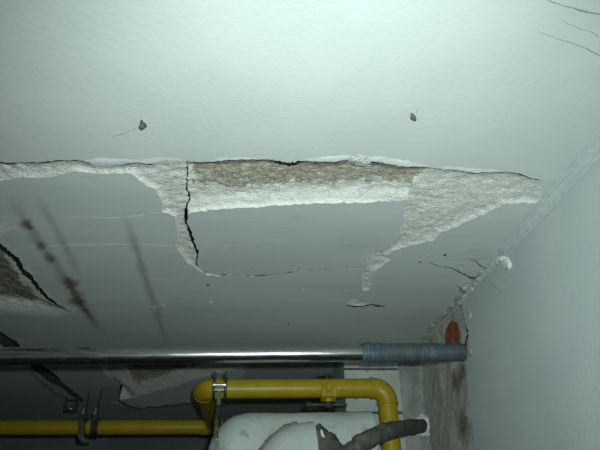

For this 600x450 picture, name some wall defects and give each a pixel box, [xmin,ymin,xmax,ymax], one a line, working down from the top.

crack [0,159,95,167]
crack [371,162,541,181]
crack [184,159,349,273]
spalling [0,155,544,291]
spalling [0,222,84,317]
crack [0,244,170,312]
crack [433,259,486,293]
spalling [101,363,242,400]